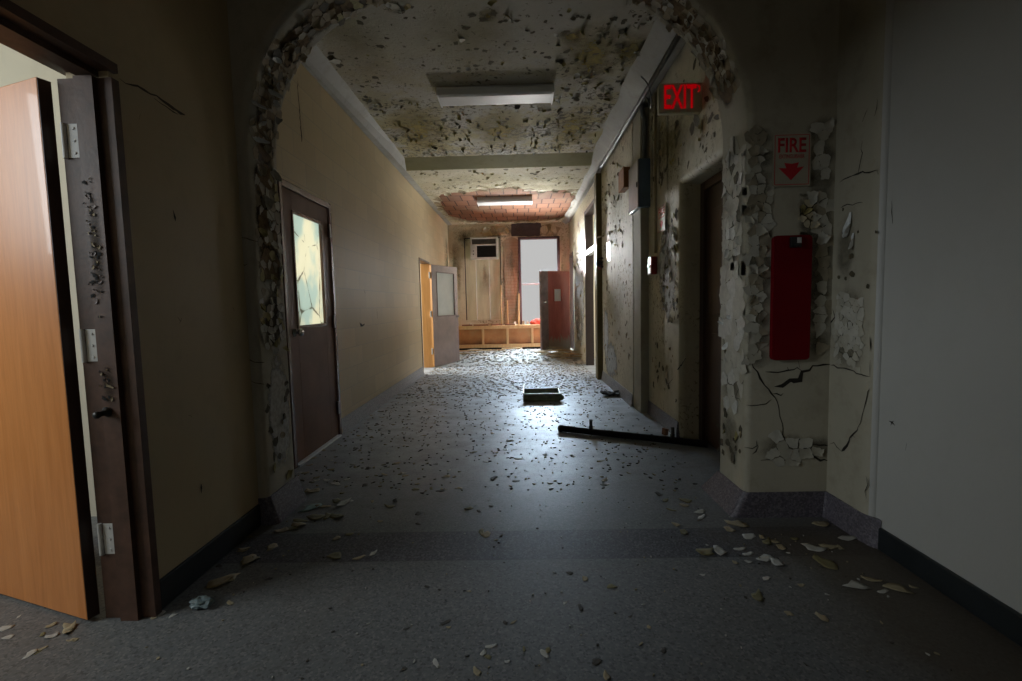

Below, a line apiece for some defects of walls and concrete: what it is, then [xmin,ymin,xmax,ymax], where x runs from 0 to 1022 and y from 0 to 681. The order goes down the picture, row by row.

peeling [249,0,416,354]
flaking render [420,167,587,223]
peeling [357,0,741,198]
peeling [602,161,624,254]
peeling [603,266,630,376]
peeling [659,208,679,323]
peeling [716,124,777,464]
crack [735,305,871,462]
peeling [798,117,870,374]